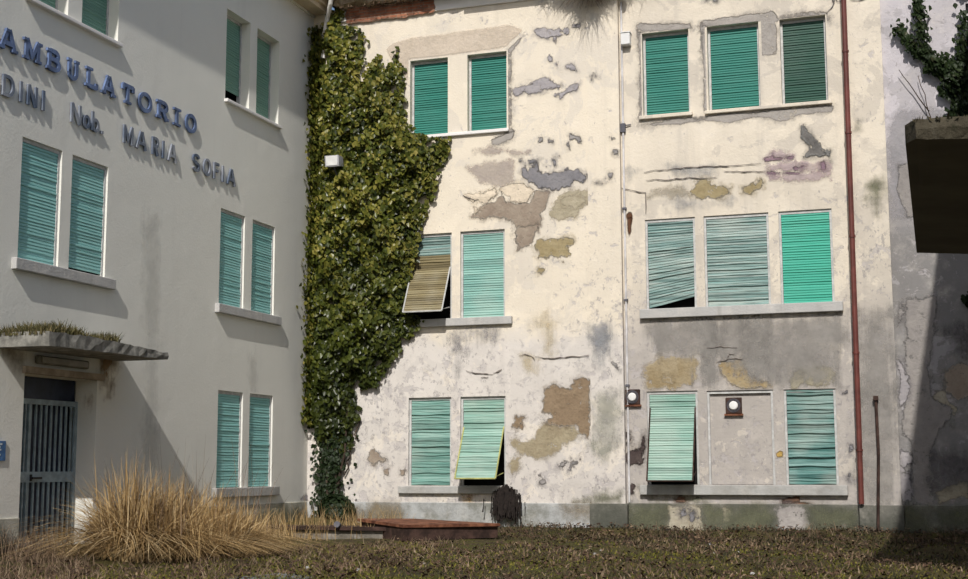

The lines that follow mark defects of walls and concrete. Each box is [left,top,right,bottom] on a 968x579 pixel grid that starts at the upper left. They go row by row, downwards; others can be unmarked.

peeling [534,23,581,43]
peeling [511,77,578,99]
peeling [690,124,832,200]
flaking render [471,133,614,274]
flaking render [643,355,700,391]
flaking render [895,296,968,505]
flaking render [508,377,591,473]
flaking render [667,496,704,531]
flaking render [774,496,810,530]